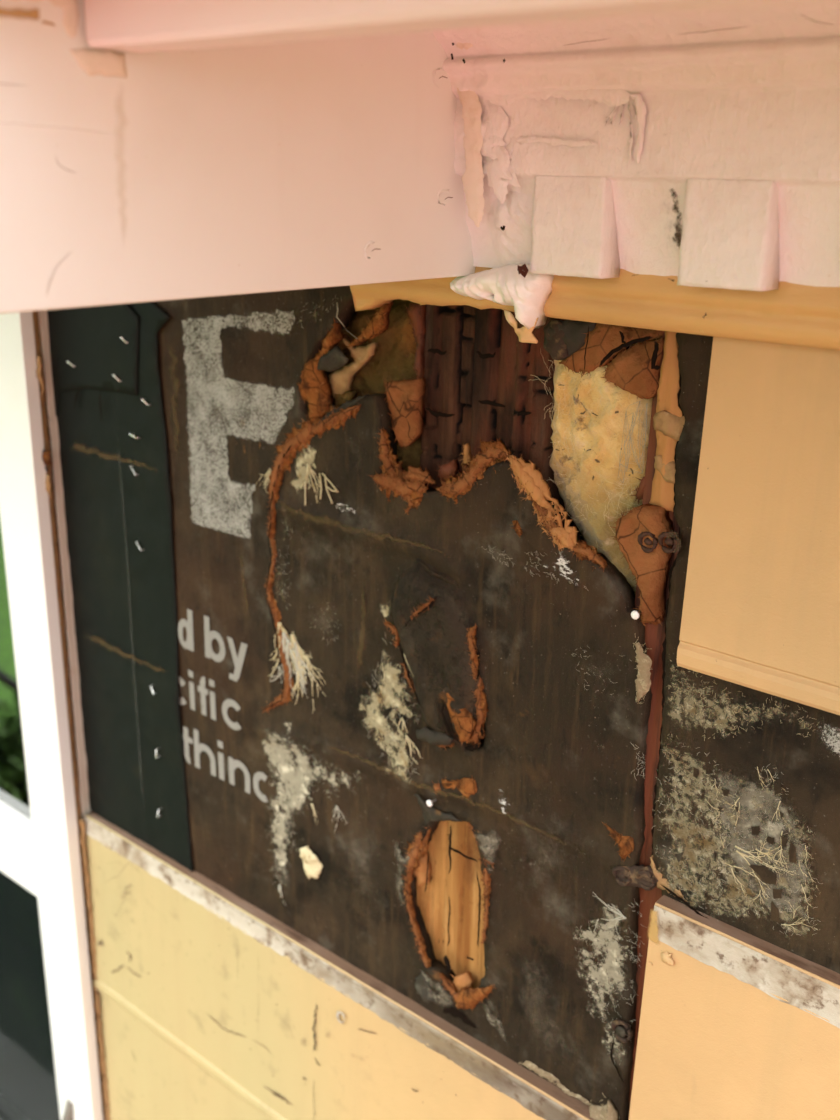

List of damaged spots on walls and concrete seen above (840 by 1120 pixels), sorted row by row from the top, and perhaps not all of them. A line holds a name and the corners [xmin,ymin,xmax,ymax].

peeling [297,302,426,448]
peeling [504,309,538,344]
peeling [559,323,665,399]
water stain [262,622,475,904]
mould [651,656,823,936]
peeling [413,852,432,887]
peeling [452,971,474,992]
water stain [573,892,631,1063]